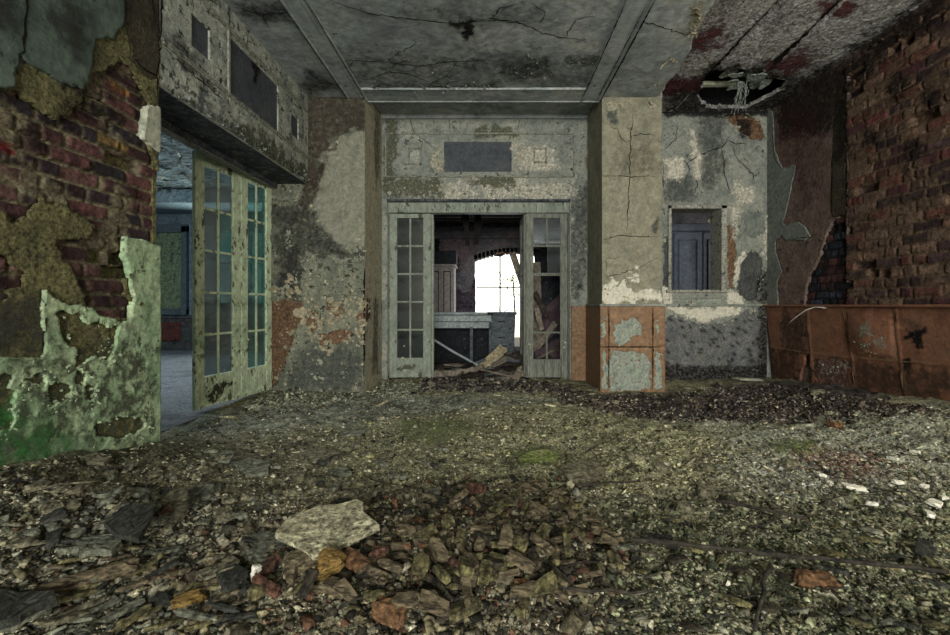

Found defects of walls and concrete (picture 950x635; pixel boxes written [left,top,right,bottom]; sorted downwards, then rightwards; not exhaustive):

spalling [0,57,192,440]
water stain [271,70,379,301]
peeling [262,272,391,388]
crack [330,0,594,84]
spalling [600,209,768,393]
crack [603,115,782,277]
peeling [722,113,767,141]
spalling [806,0,950,305]